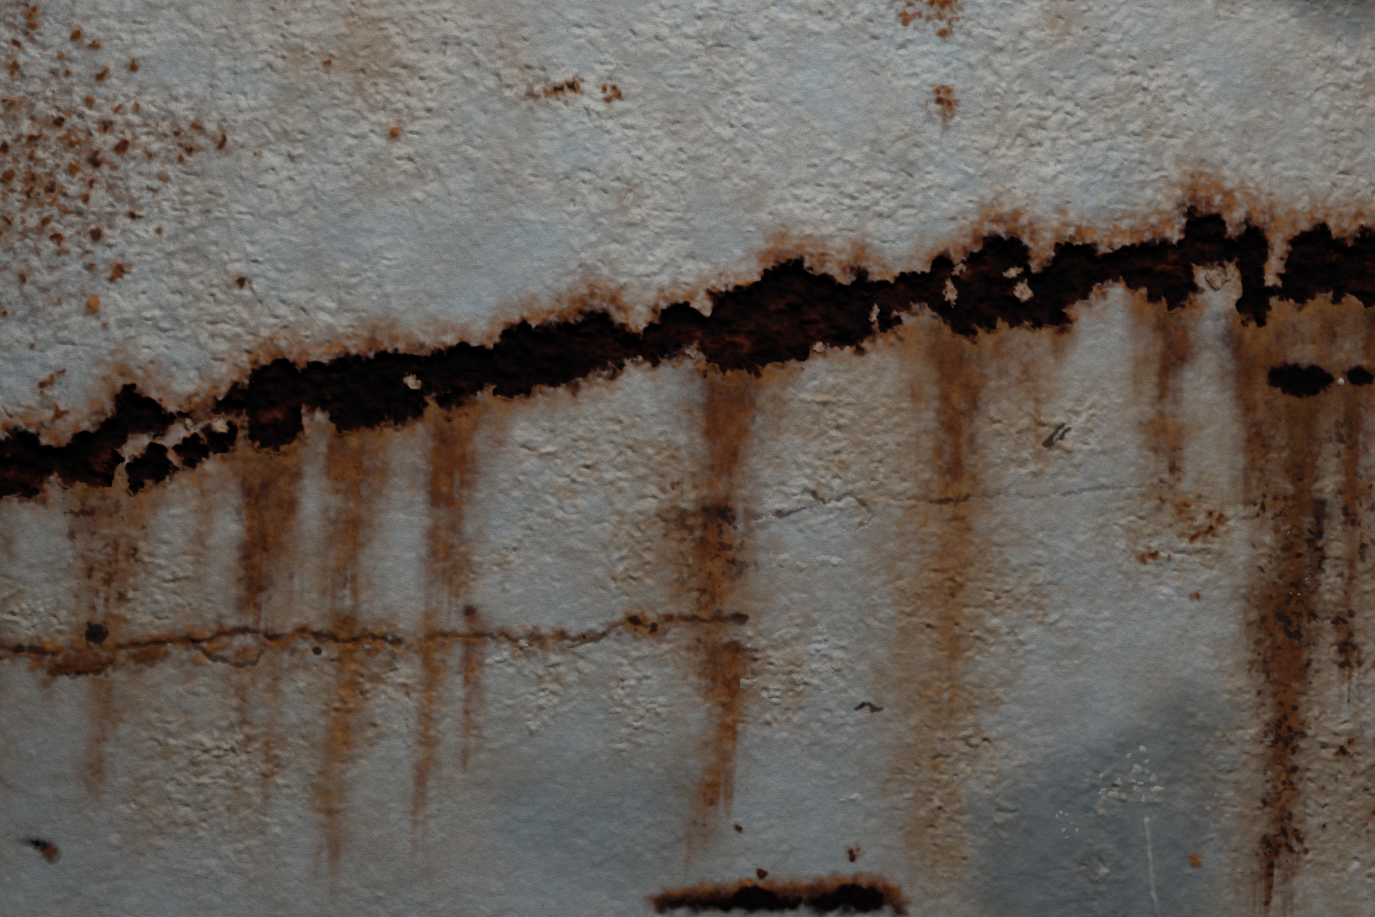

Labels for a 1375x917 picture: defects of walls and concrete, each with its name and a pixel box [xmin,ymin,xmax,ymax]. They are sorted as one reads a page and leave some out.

rust [899,0,959,37]
rust [0,98,140,256]
rust [38,369,70,422]
rust [59,479,159,621]
rust [231,421,387,767]
crack [0,613,749,685]
rust [424,398,502,596]
rust [663,363,778,807]
rust [904,318,1006,620]
rust [1132,296,1225,541]
rust [1221,301,1375,911]
rust [649,848,908,916]